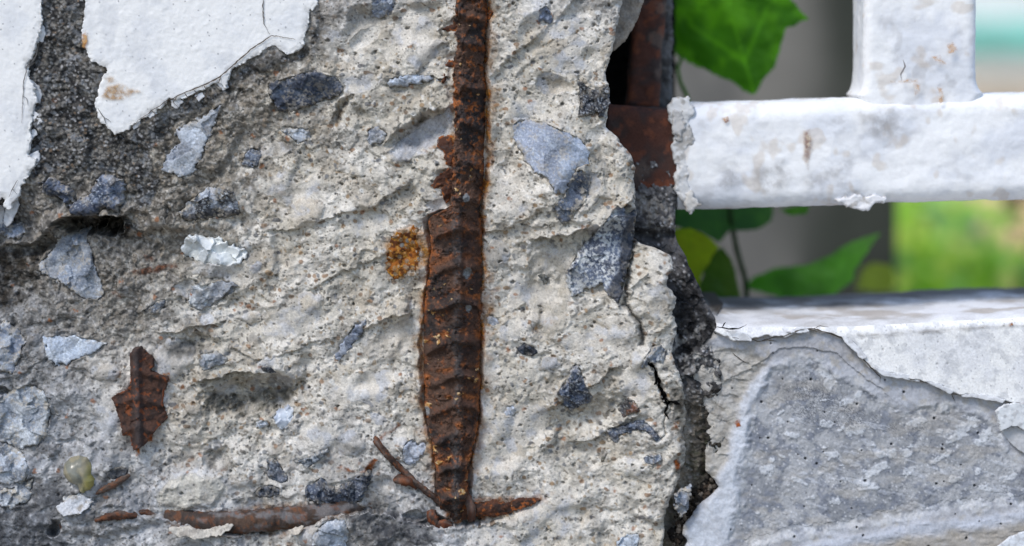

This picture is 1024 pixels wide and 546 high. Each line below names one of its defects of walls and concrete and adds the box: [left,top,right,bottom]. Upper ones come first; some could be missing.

flaking render [29,0,324,208]
rust [624,0,667,107]
peeling [667,96,703,214]
rust [385,225,428,280]
spalling [364,0,493,523]
peeling [56,495,94,517]
spalling [111,346,169,451]
spalling [157,450,232,511]
peeling [169,523,234,540]
crack [648,362,681,419]
spalling [739,336,1024,542]
peeling [998,531,1024,546]